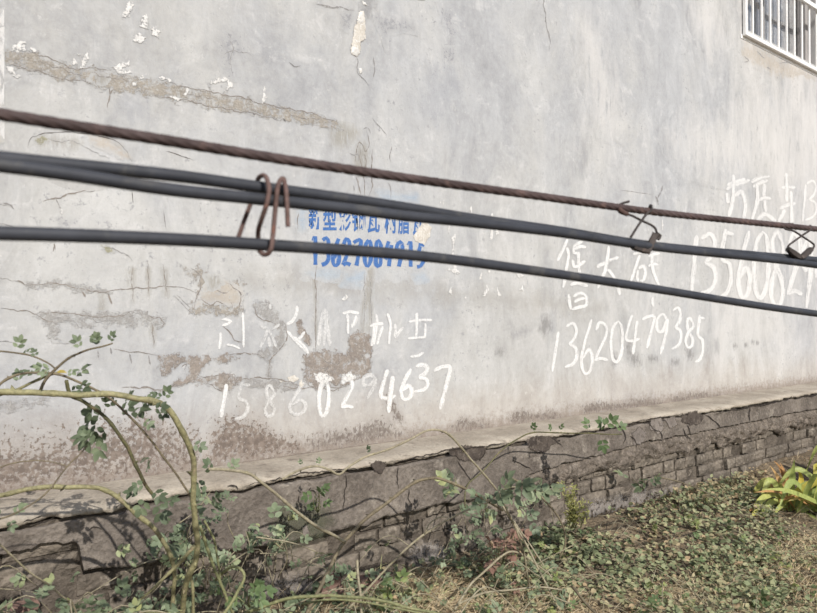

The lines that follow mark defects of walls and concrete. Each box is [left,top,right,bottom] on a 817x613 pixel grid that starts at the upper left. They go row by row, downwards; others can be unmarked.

flaking render [0,6,344,133]
flaking render [317,0,378,84]
crack [45,190,95,214]
flaking render [2,263,373,394]
damp [0,387,430,495]